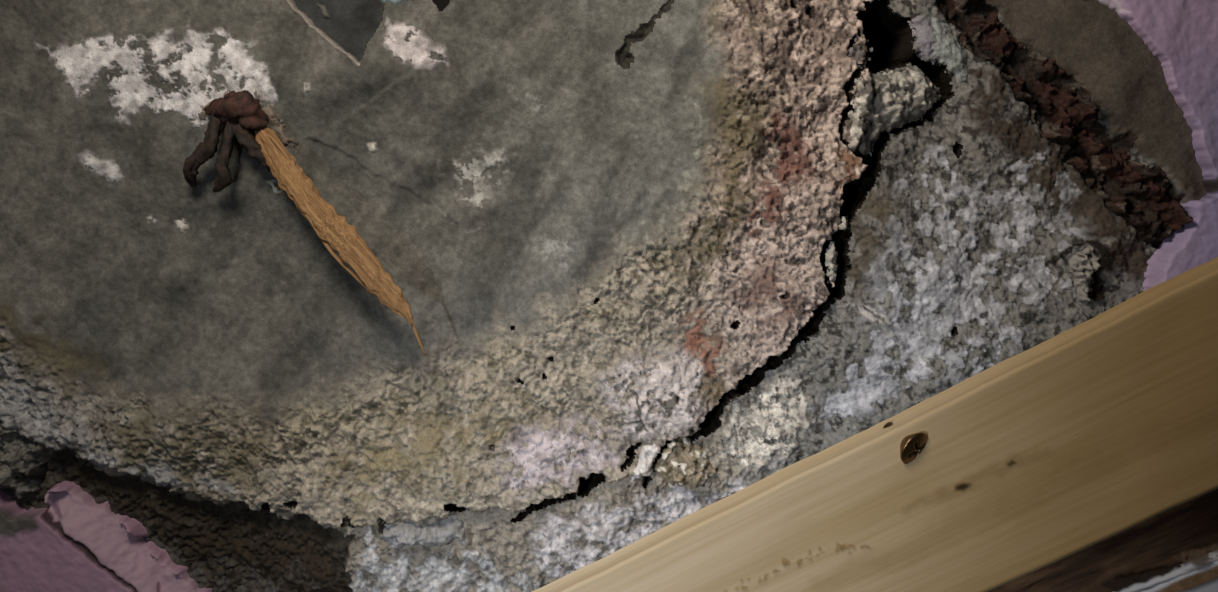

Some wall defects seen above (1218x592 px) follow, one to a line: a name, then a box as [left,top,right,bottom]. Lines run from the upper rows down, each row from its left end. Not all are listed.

spalling [287,0,401,66]
spalling [936,0,1194,249]
damp [81,153,123,181]
damp [454,151,509,208]
crack [511,0,955,523]
spalling [1060,240,1114,305]
damp [530,71,1147,579]
damp [0,384,541,592]
spalling [261,501,297,513]
damp [484,415,622,491]